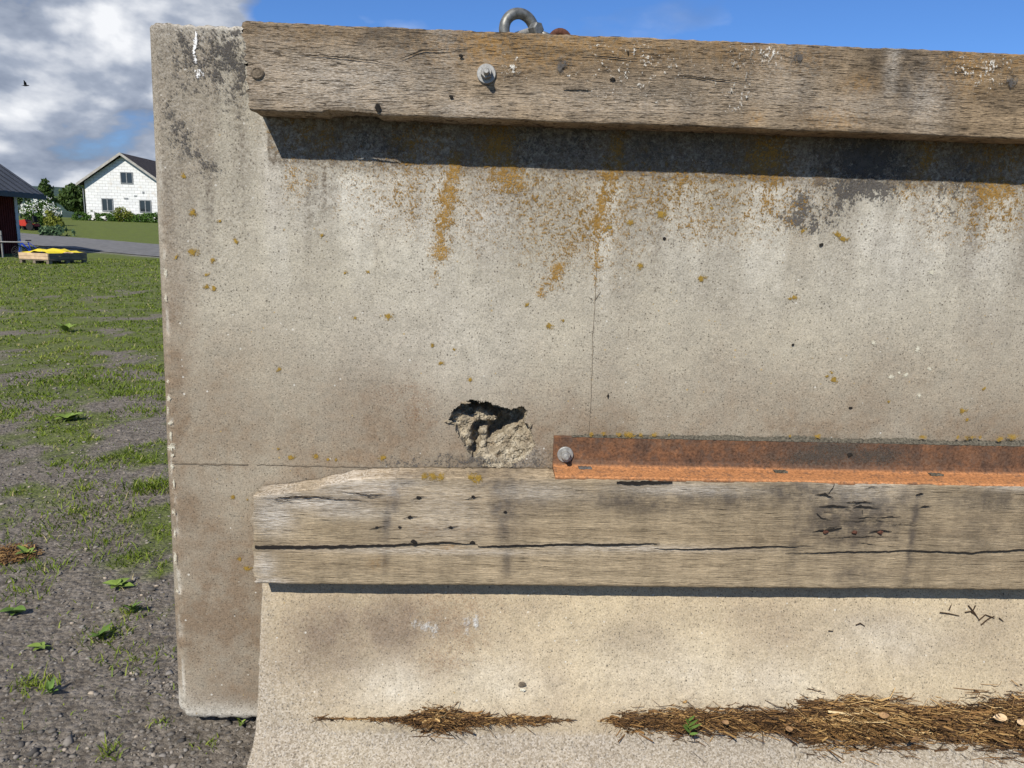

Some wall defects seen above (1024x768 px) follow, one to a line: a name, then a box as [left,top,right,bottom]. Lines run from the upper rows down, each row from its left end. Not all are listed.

spalling [444,399,535,468]